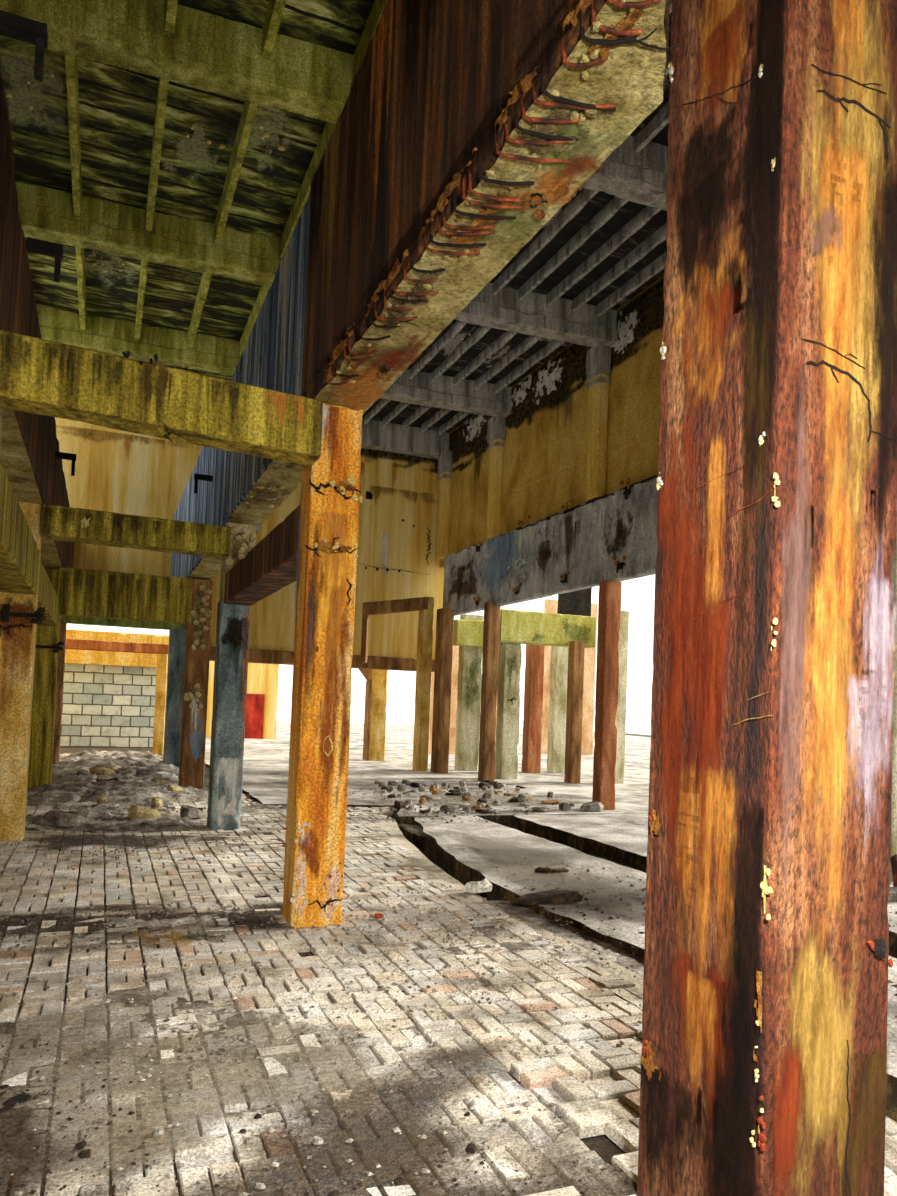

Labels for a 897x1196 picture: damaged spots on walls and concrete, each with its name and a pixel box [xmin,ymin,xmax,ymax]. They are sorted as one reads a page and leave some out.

crack [309,478,361,500]
rust [318,497,356,803]
damp [306,91,513,394]
spalling [324,61,616,385]
damp [360,344,592,491]
damp [560,505,605,570]
damp [610,278,664,371]
rust [659,421,736,1088]
crack [802,338,896,451]
rust [804,0,894,902]
crack [812,64,891,160]
rust [774,941,851,1184]